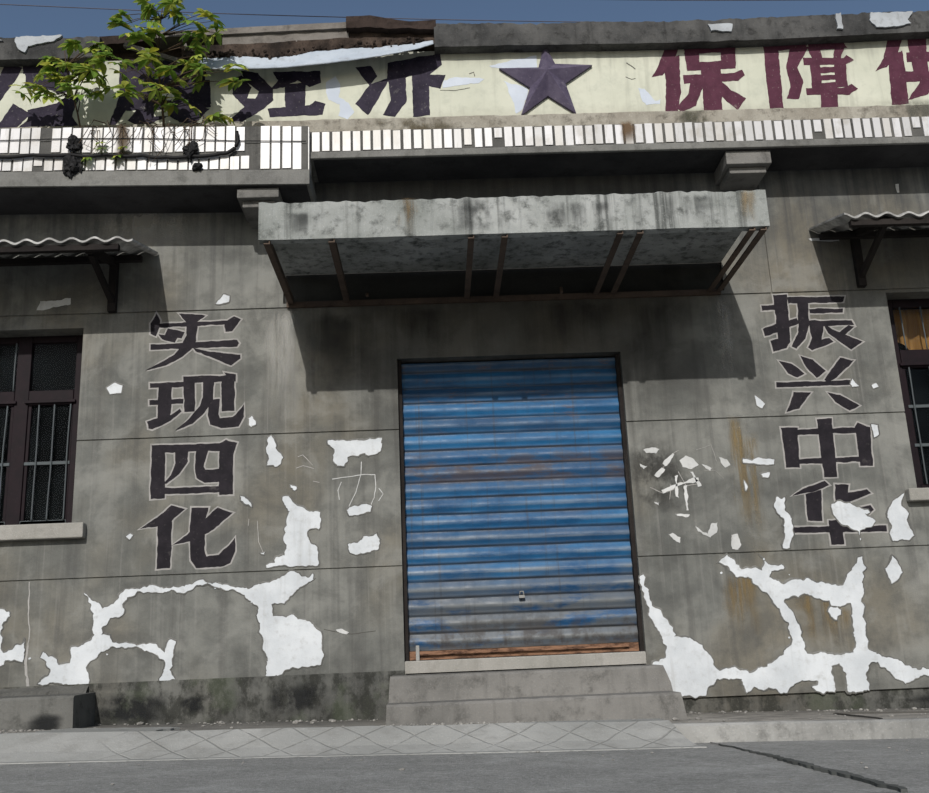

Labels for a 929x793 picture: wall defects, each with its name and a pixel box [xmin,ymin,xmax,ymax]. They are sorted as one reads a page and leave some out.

spalling [15,34,63,54]
peeling [105,382,124,395]
peeling [265,435,284,468]
peeling [326,437,383,468]
peeling [644,447,674,477]
peeling [741,456,775,479]
peeling [661,472,702,517]
peeling [772,495,795,550]
peeling [830,493,915,542]
peeling [347,531,381,556]
peeling [0,484,325,686]
peeling [638,534,929,699]